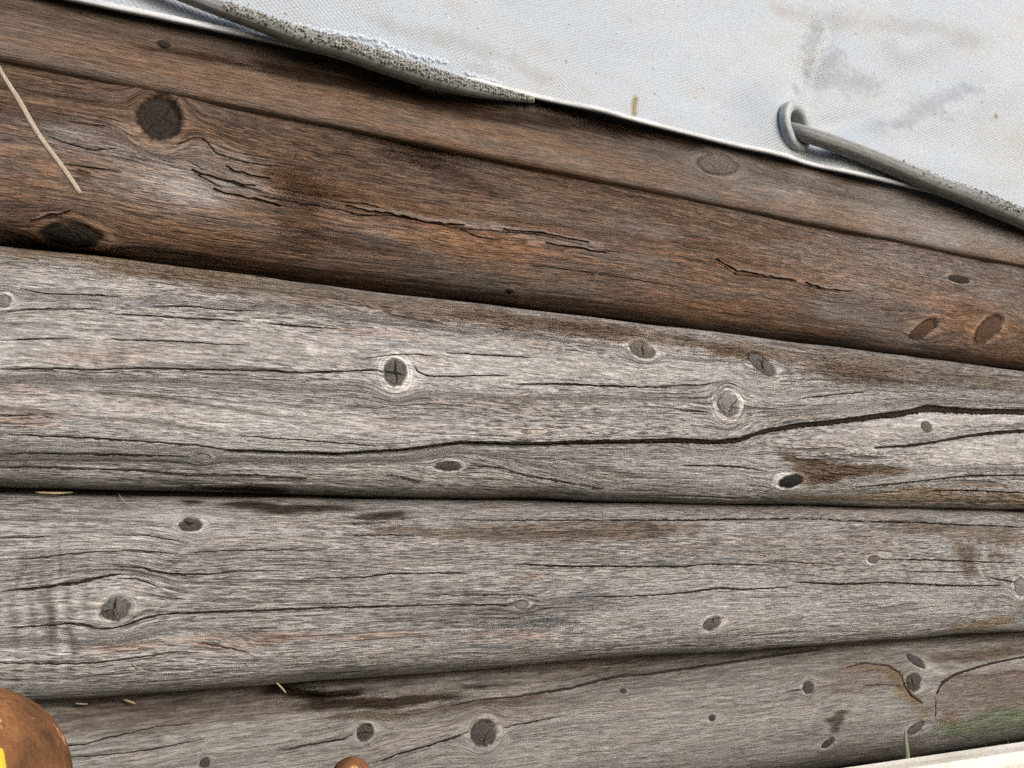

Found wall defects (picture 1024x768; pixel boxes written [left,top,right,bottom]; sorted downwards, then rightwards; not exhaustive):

crack [177,137,683,288]
crack [686,258,843,293]
crack [1,391,1024,489]
crack [849,656,1024,719]